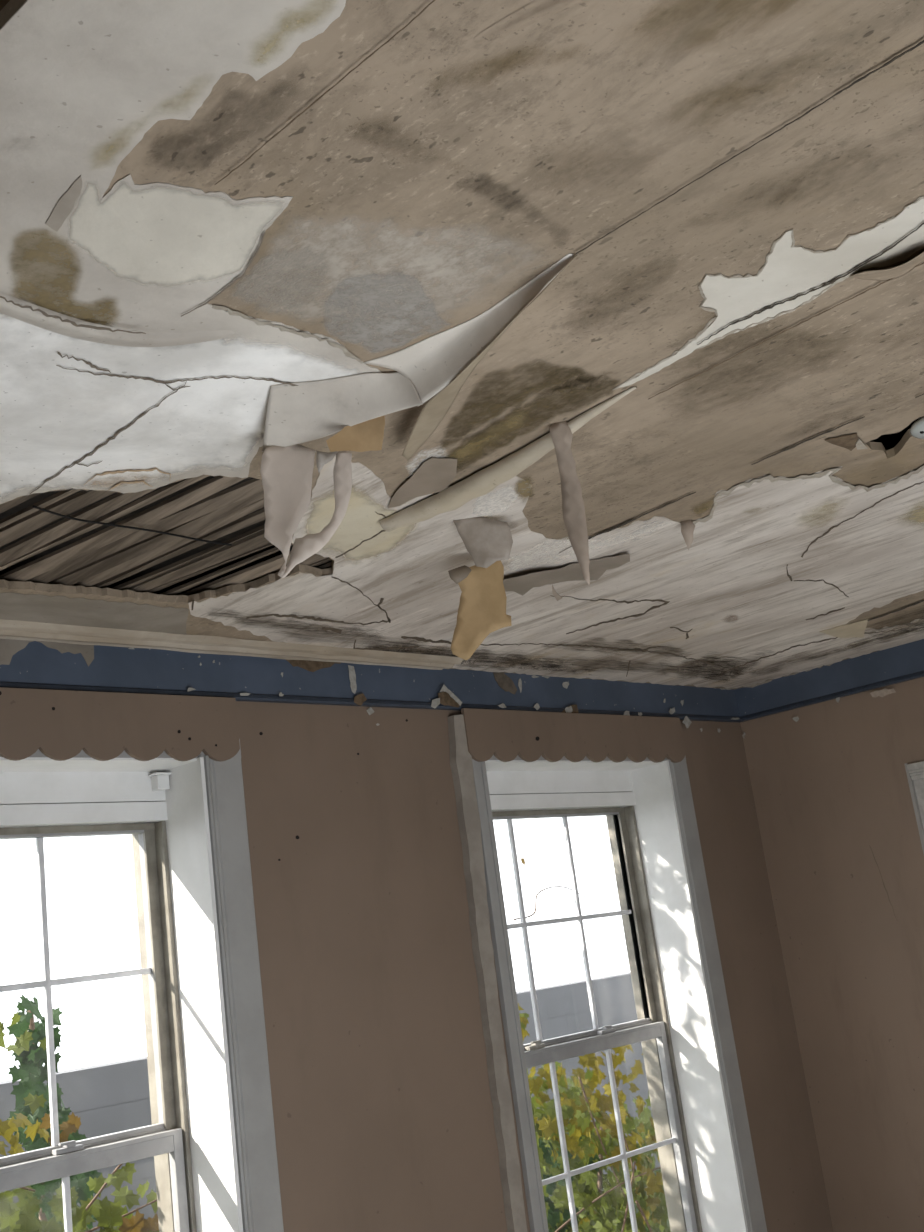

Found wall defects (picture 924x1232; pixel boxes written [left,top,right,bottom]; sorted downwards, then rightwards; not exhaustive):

crack [576,40,924,254]
leakage [13,232,115,325]
crack [0,296,146,334]
crack [30,352,299,494]
crack [181,232,266,317]
flaking render [0,0,924,732]
leakage [444,364,618,472]
crack [648,223,924,400]
crack [246,511,451,650]
leakage [216,609,924,679]
crack [480,482,924,677]